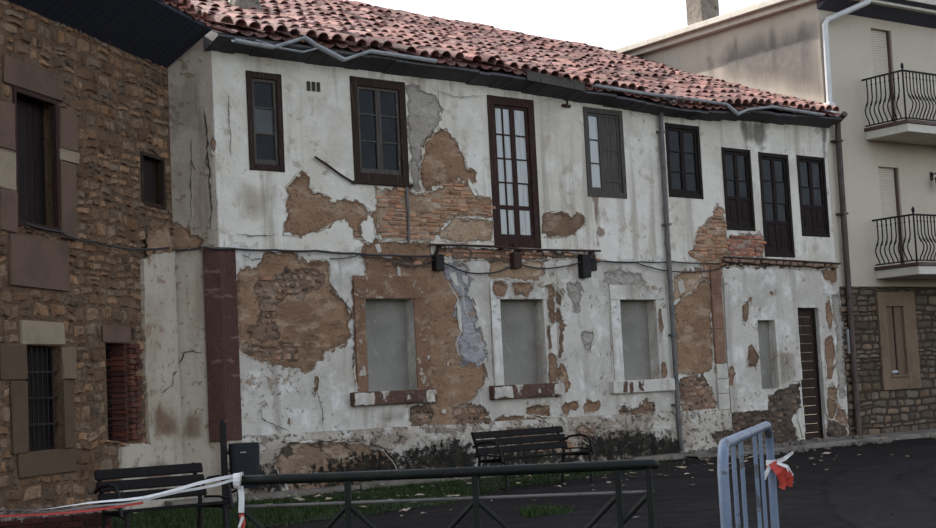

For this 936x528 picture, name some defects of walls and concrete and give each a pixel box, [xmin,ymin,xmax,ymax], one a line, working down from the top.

crack [190,97,231,228]
crack [239,234,277,261]
spalling [282,83,601,445]
spalling [603,267,647,286]
spalling [237,251,375,406]
spalling [661,203,848,447]
crack [161,348,203,393]
spalling [616,380,656,416]
water stain [228,429,680,494]